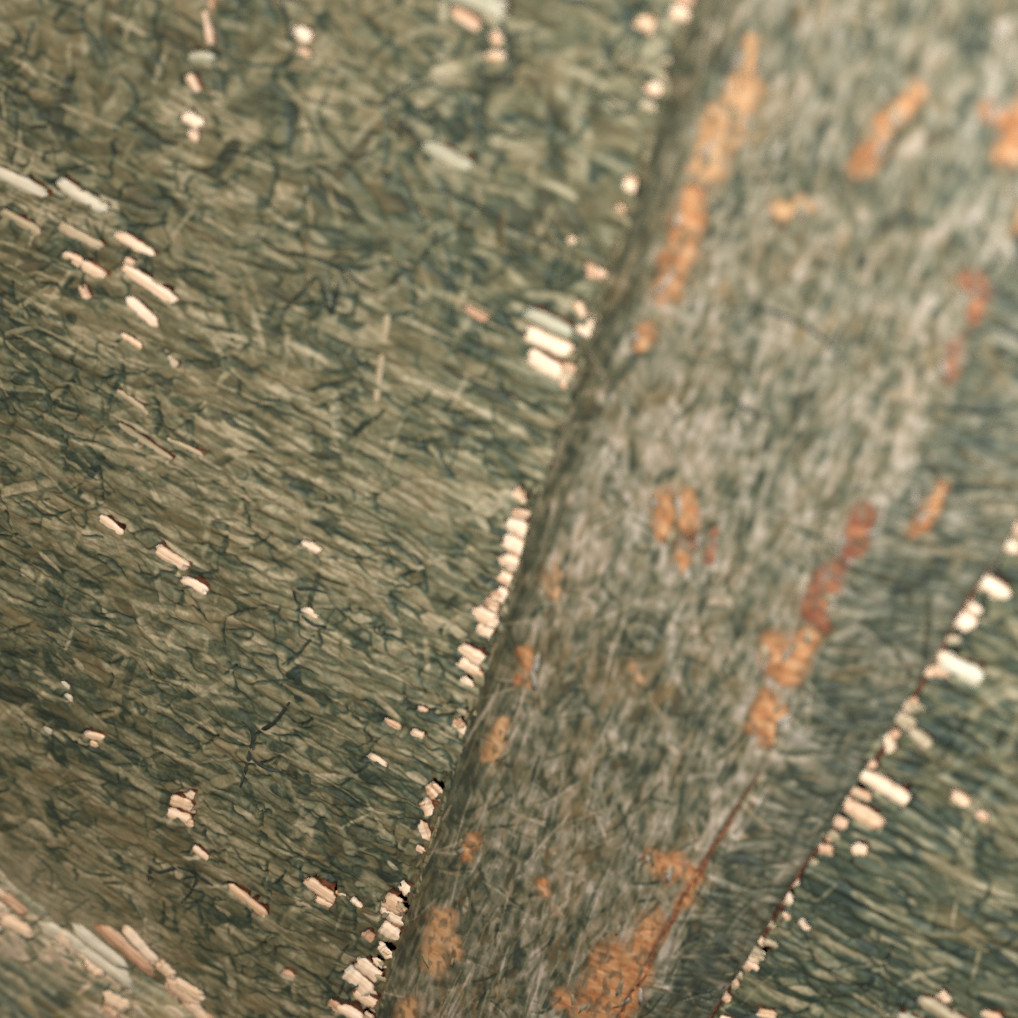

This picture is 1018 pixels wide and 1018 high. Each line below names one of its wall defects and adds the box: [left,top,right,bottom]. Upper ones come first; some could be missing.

peeling [57,218,179,327]
crack [257,234,378,316]
crack [292,586,329,627]
peeling [456,484,531,687]
rust [795,502,879,634]
peeling [923,571,1011,687]
crack [240,702,290,788]
peeling [807,696,933,866]
peeling [0,888,213,1018]
crack [147,865,212,903]
peeling [328,879,413,1018]
crack [618,777,757,1018]